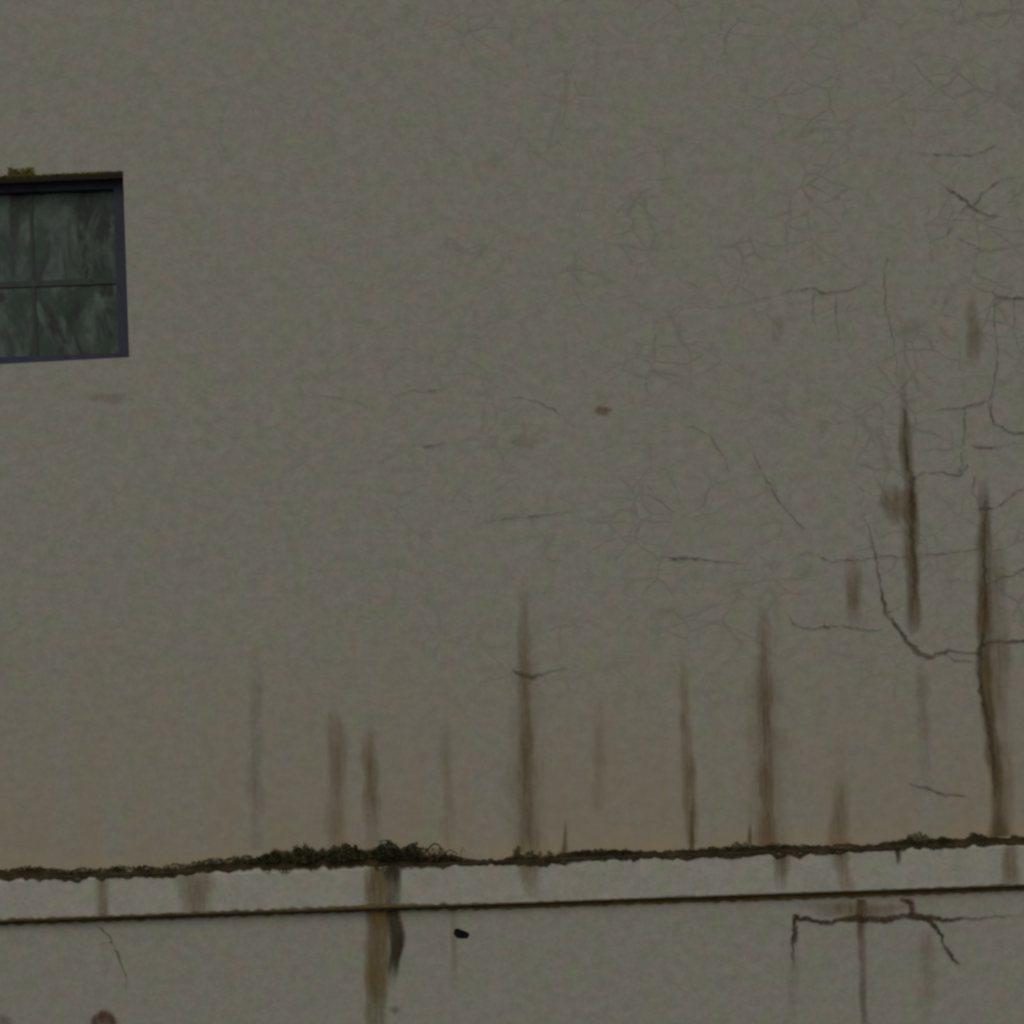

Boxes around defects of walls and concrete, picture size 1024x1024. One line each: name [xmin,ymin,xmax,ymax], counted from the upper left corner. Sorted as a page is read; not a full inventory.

crack [891,454,916,587]
water stain [902,431,918,620]
crack [881,595,942,658]
crack [978,565,1024,774]
crack [0,832,1024,882]
water stain [387,910,403,969]
crack [791,899,962,962]